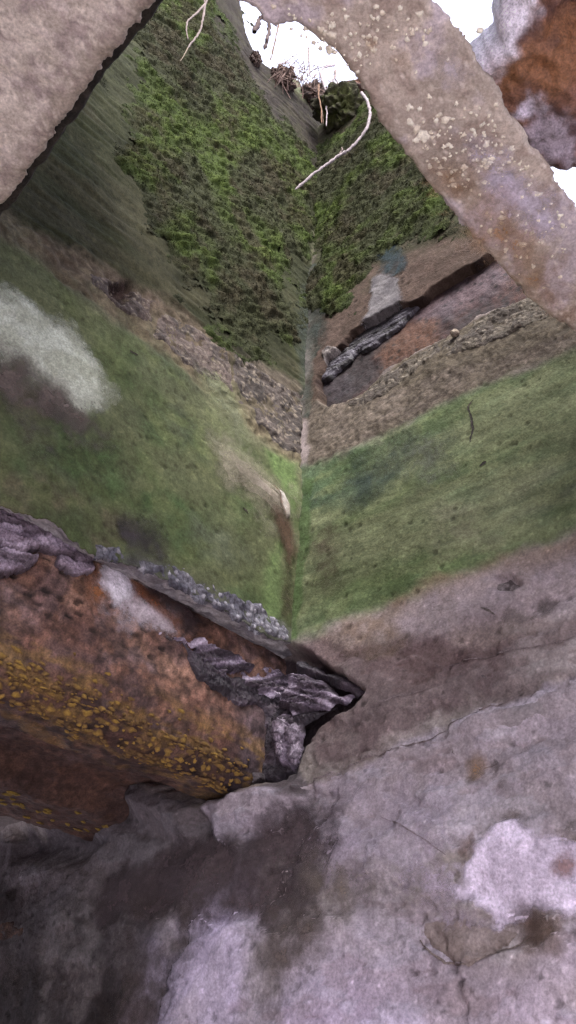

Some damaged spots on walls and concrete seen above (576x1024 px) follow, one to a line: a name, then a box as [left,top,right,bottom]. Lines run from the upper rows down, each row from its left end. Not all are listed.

crack [297,694,520,785]